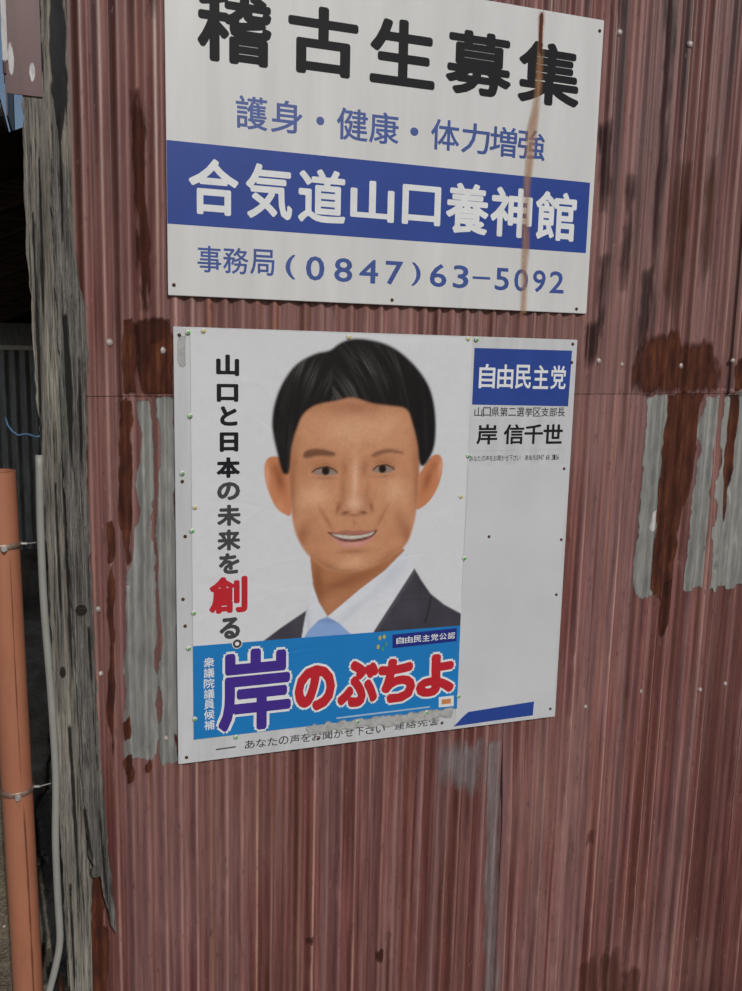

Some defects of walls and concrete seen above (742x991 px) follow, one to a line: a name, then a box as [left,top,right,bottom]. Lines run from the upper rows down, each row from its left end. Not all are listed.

rust [522,13,543,310]
peeling [123,396,178,766]
peeling [633,393,668,599]
rust [632,331,721,635]
peeling [683,391,742,592]
rust [723,358,742,521]